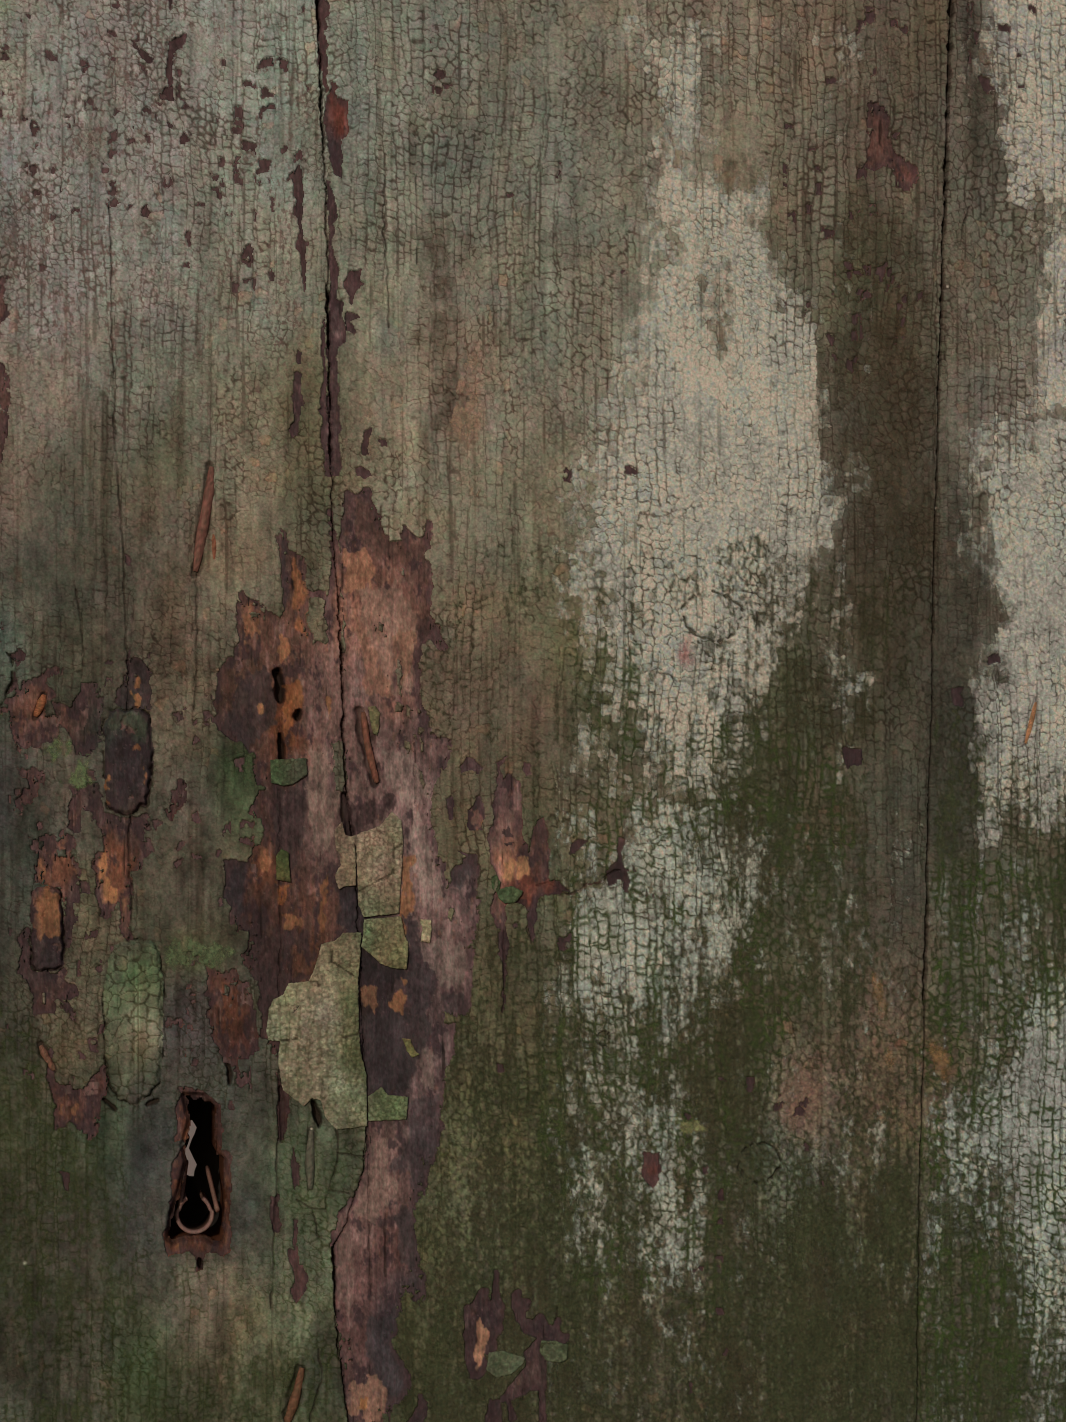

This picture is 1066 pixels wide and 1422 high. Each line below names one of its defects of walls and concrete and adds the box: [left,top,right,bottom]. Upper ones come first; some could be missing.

peeling [857,102,919,191]
damp [546,15,878,1302]
peeling [0,0,573,1422]
peeling [569,839,589,855]
peeling [606,837,655,898]
damp [844,1121,886,1178]
damp [922,899,1066,1422]